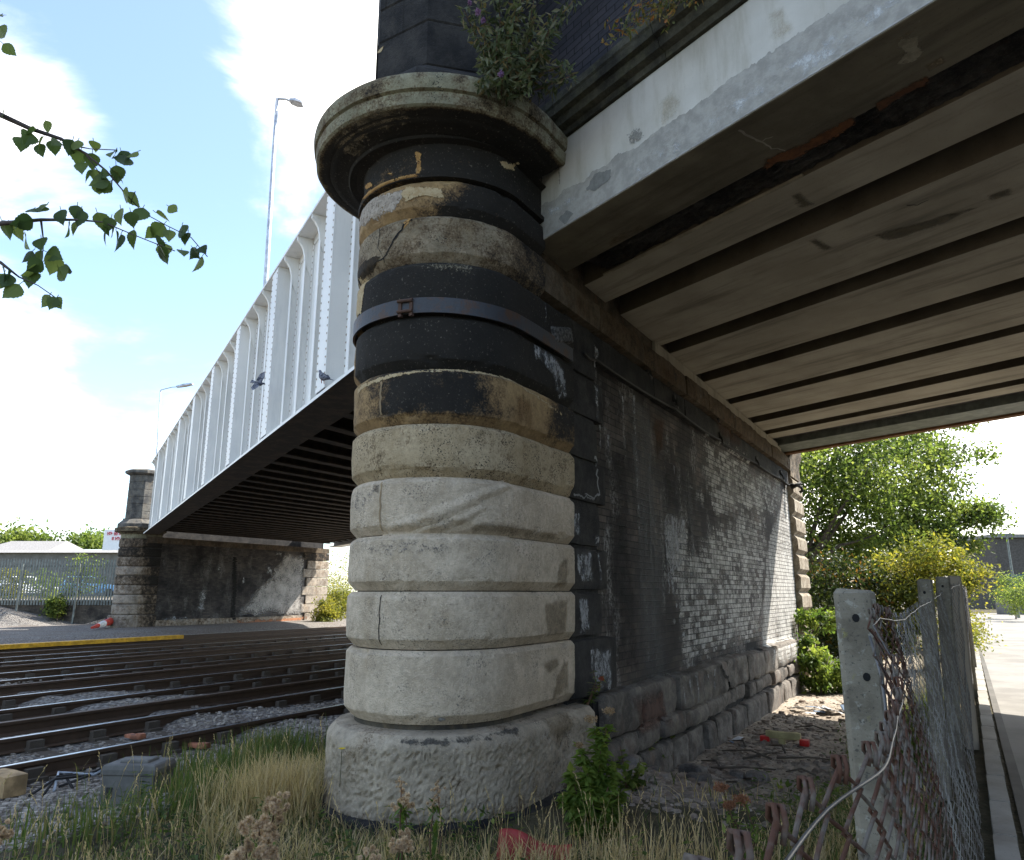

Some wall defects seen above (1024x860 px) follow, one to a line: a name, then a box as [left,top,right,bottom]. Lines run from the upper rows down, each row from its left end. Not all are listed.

crack [371,217,416,270]
peeling [359,151,444,230]
peeling [540,0,933,239]
damp [622,395,799,663]